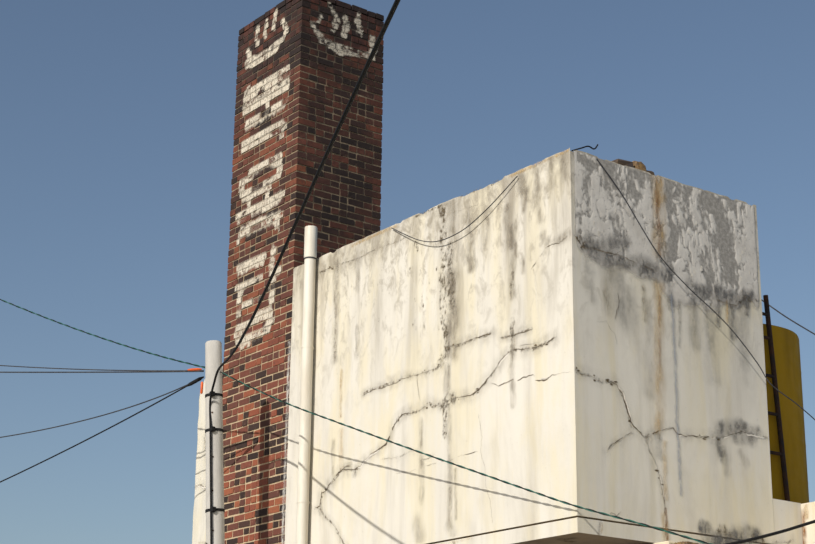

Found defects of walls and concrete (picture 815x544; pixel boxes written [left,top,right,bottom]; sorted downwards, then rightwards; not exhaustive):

damp [436,249,457,359]
damp [694,286,753,322]
crack [316,329,767,544]